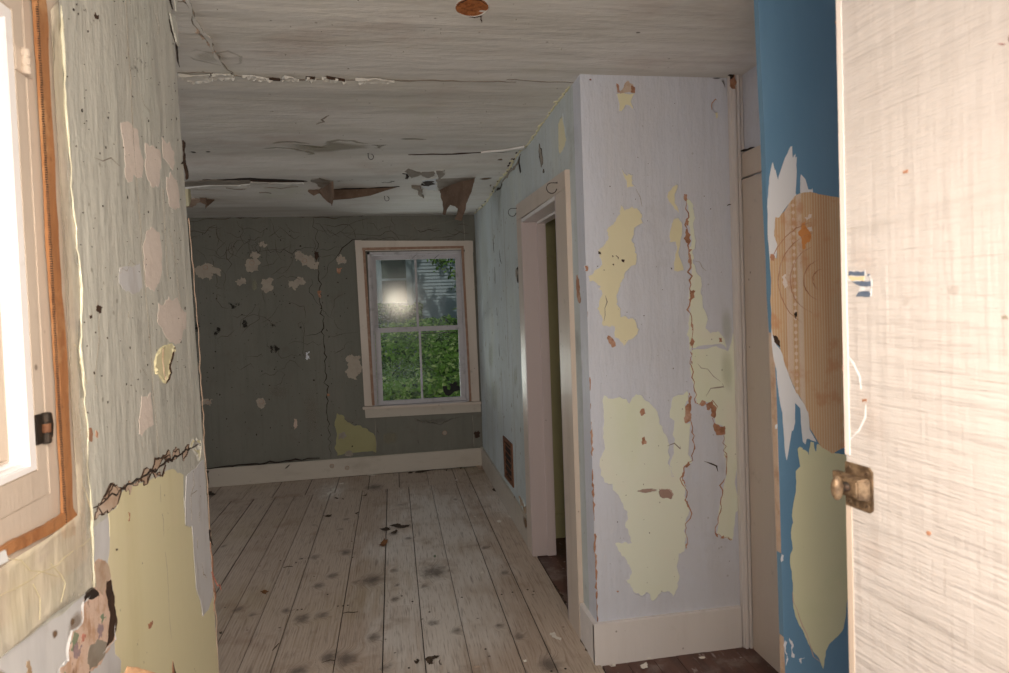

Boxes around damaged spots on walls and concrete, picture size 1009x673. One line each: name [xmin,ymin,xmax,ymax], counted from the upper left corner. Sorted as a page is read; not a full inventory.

crack [177,0,574,85]
crack [94,0,468,577]
peeling [404,168,445,179]
peeling [576,168,645,348]
peeling [798,214,812,249]
peeling [334,410,377,457]
peeling [590,183,738,601]
peeling [0,586,92,673]
peeling [87,438,219,673]
peeling [781,439,848,668]